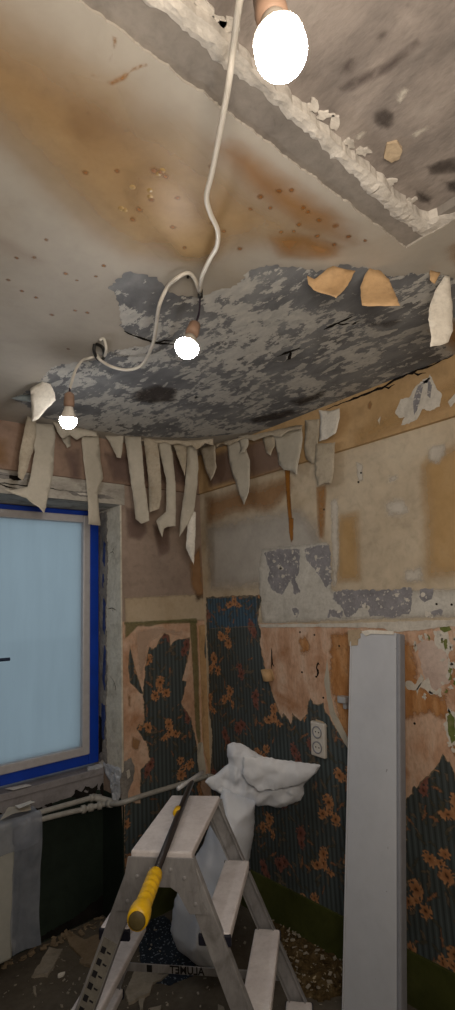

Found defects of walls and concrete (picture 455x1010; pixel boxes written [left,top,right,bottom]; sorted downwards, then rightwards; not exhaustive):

peeling [193,0,240,32]
leakage [0,38,331,258]
peeling [307,97,340,131]
peeling [343,137,372,156]
peeling [384,140,402,163]
spalling [14,264,455,438]
flaking render [119,620,211,806]
flaking render [258,545,455,798]